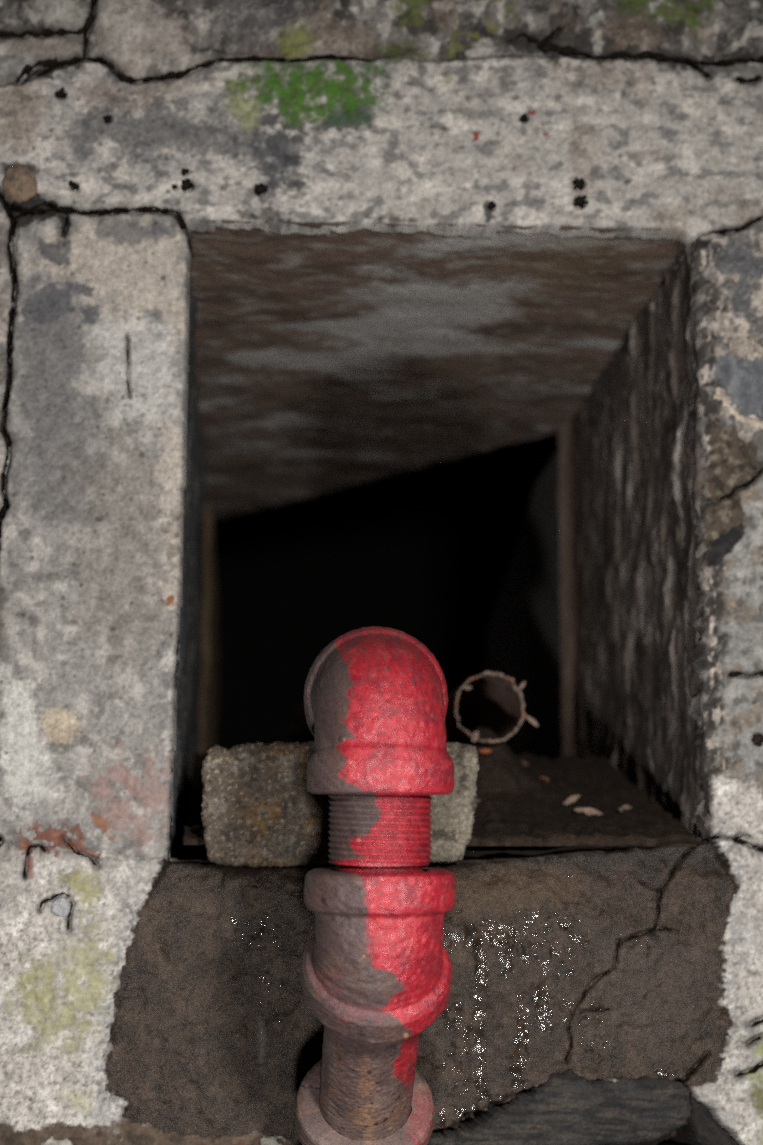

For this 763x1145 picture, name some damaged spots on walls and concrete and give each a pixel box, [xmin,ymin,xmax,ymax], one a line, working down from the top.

crack [0,0,373,84]
crack [510,27,763,83]
crack [702,216,763,236]
crack [0,194,194,538]
crack [720,468,763,499]
crack [728,670,763,678]
rust [19,824,101,878]
crack [565,835,763,1063]
crack [682,1053,708,1082]
crack [737,1019,763,1075]